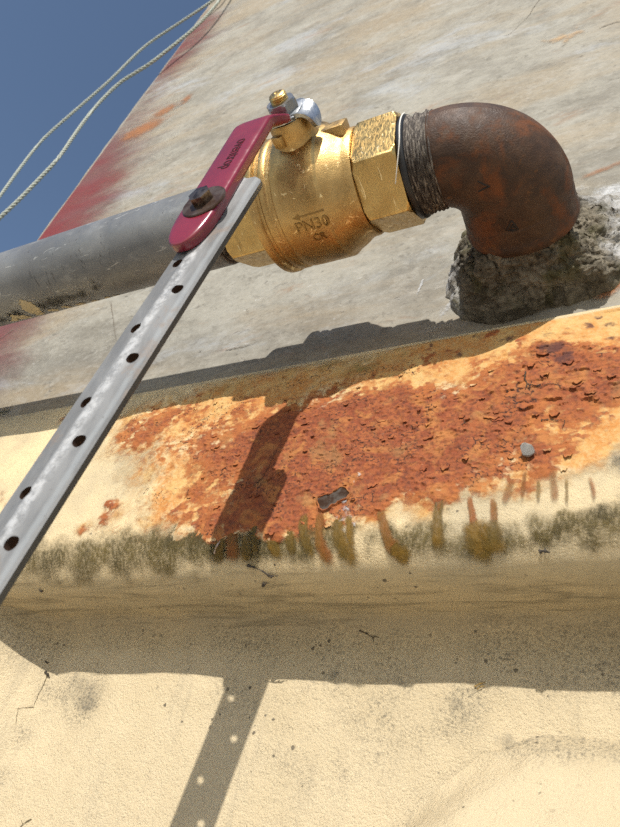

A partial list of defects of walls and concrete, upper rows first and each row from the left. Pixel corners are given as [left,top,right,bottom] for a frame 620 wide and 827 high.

corrosion [551,472,568,500]
corrosion [214,514,356,565]
corrosion [377,510,410,565]
corrosion [431,500,443,546]
corrosion [465,481,512,561]